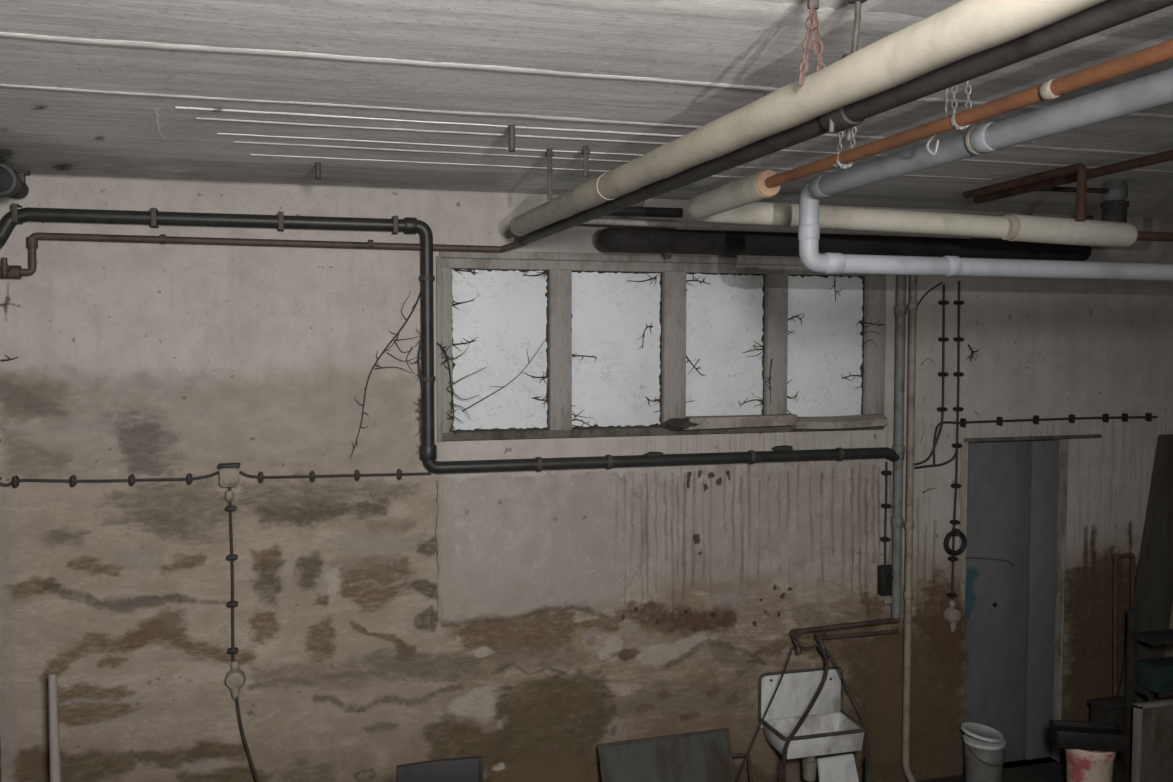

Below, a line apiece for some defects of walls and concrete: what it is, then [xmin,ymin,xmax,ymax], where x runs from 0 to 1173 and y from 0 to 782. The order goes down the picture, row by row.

leakage [687,470,730,491]
leakage [251,550,283,640]
leakage [297,556,409,607]
leakage [57,685,132,726]
leakage [11,743,266,782]
leakage [43,597,255,680]
leakage [352,607,573,678]
peeling [472,647,492,658]
leakage [425,673,616,782]
peeling [577,620,639,661]
leakage [741,571,968,782]
leakage [1062,551,1138,722]